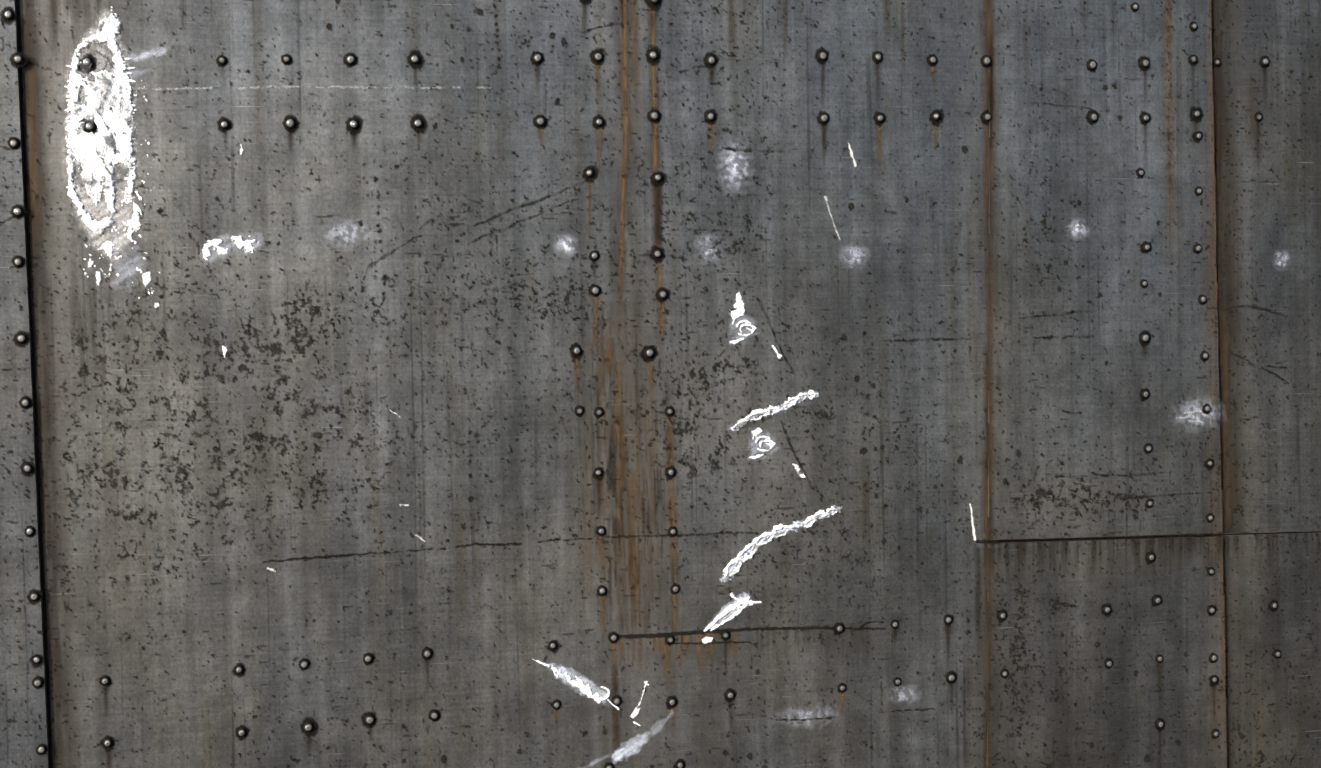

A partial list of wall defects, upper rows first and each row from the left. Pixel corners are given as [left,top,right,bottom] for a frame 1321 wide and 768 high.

corrosion [617,0,629,280]
corrosion [652,64,664,331]